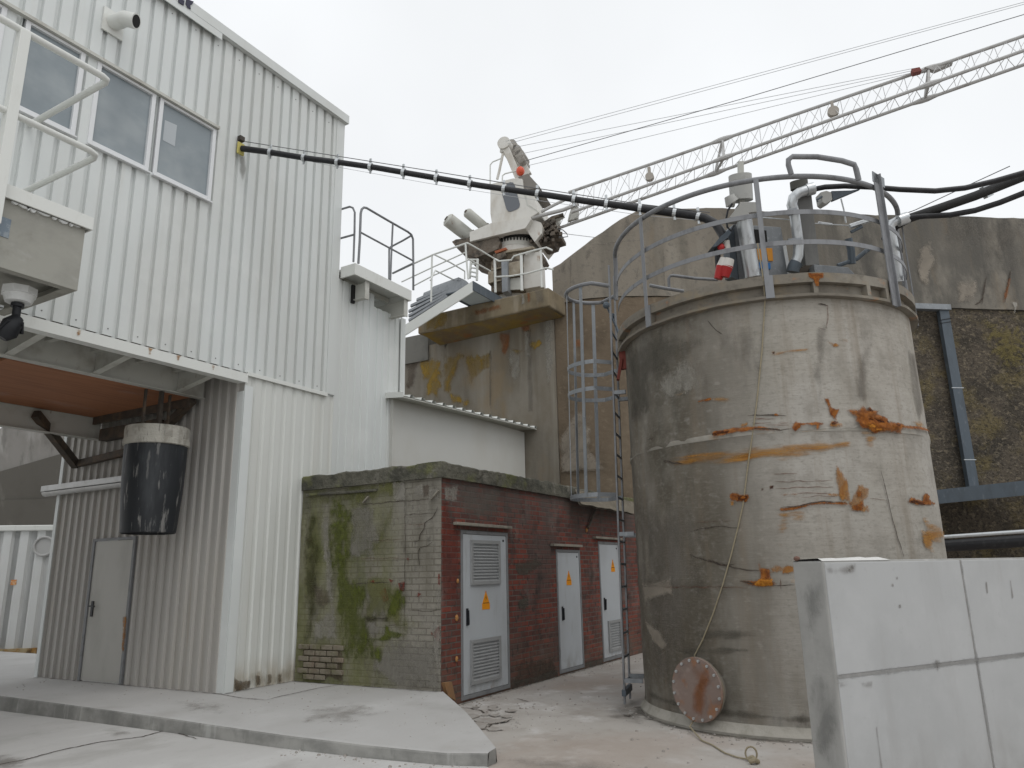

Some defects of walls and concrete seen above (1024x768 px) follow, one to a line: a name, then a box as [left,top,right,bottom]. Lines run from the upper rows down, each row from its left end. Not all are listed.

peeling [420,355,489,406]
corrosion [712,399,930,442]
corrosion [663,442,849,464]
corrosion [730,493,749,505]
corrosion [762,467,882,512]
corrosion [909,493,935,505]
corrosion [923,521,944,547]
crack [355,499,438,638]
corrosion [674,566,794,588]